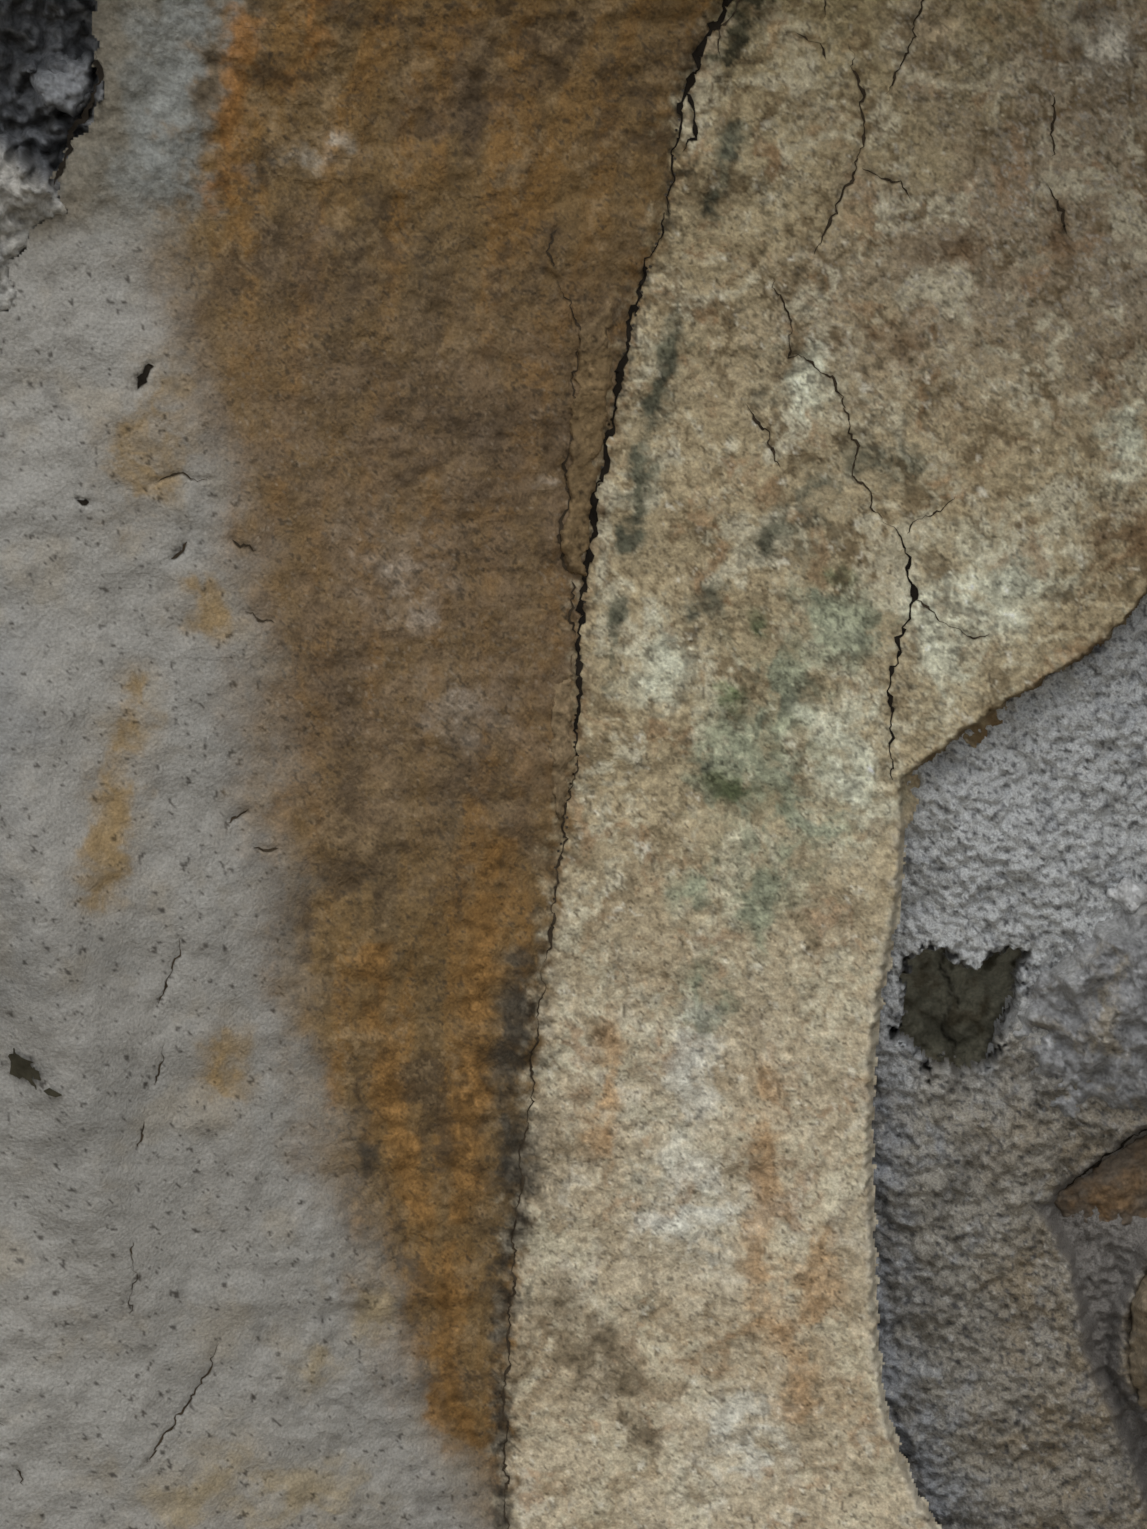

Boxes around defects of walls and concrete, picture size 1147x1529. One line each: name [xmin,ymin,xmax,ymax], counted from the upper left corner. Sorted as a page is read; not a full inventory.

corrosion [188,0,358,220]
crack [797,0,924,254]
crack [1048,91,1067,234]
corrosion [76,311,267,873]
crack [747,406,781,468]
crack [772,281,987,780]
crack [502,0,741,1529]
spalling [8,1048,62,1097]
corrosion [181,1000,273,1139]
spalling [871,594,1147,1529]
corrosion [106,1256,429,1529]